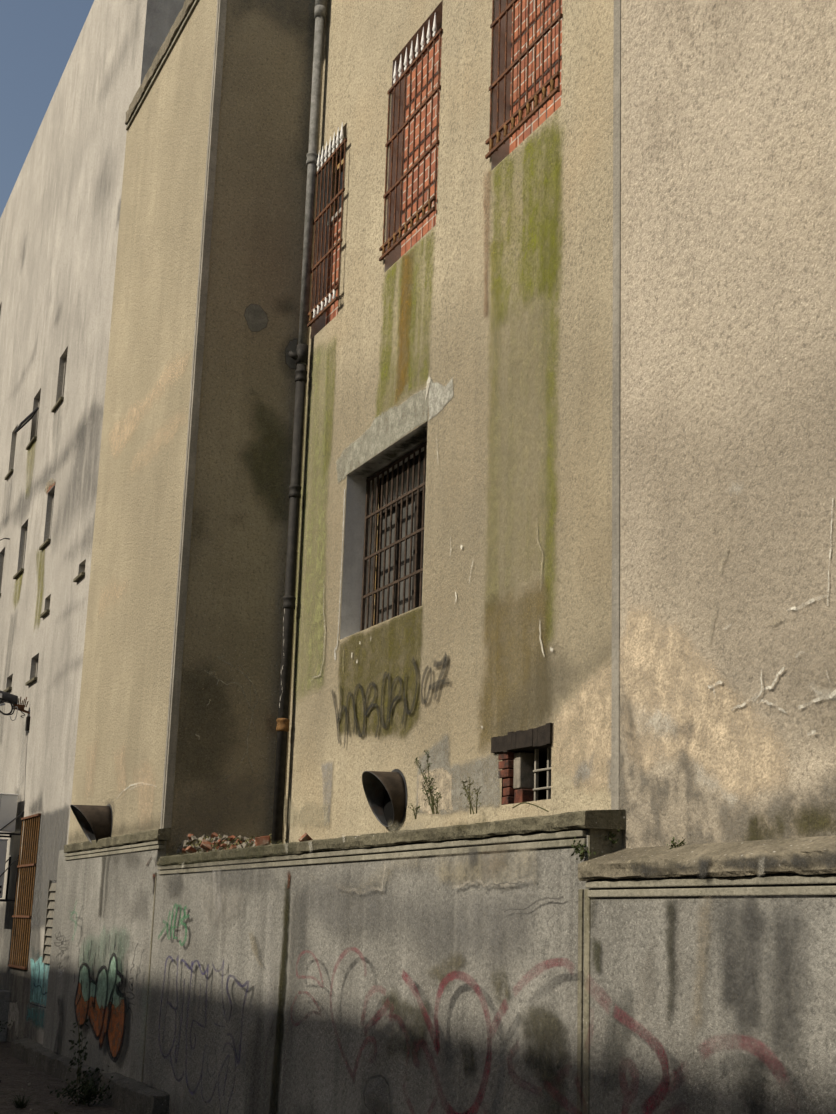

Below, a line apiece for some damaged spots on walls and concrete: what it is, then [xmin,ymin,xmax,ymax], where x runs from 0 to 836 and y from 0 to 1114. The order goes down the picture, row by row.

water stain [398,256,411,392]
water stain [666,902,674,1012]
water stain [724,902,760,1023]